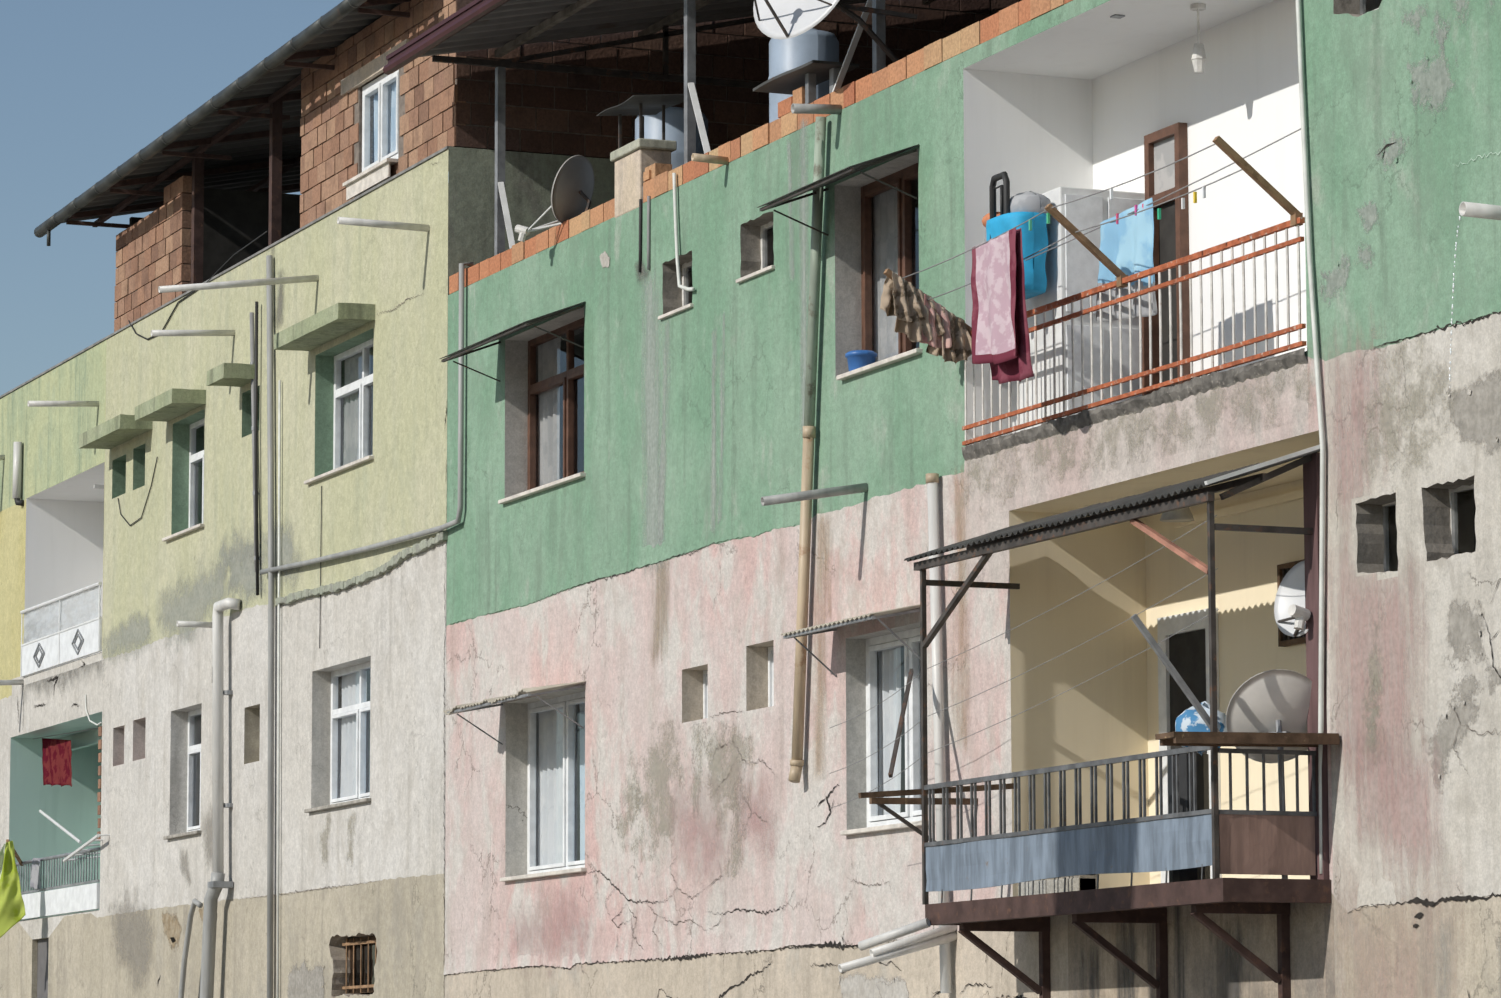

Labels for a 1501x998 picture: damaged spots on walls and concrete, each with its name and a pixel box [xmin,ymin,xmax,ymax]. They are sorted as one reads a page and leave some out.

peeling [1448,370,1501,455]
crack [1482,578,1501,678]
peeling [1429,600,1501,788]
crack [1449,704,1498,774]
crack [1348,861,1501,928]